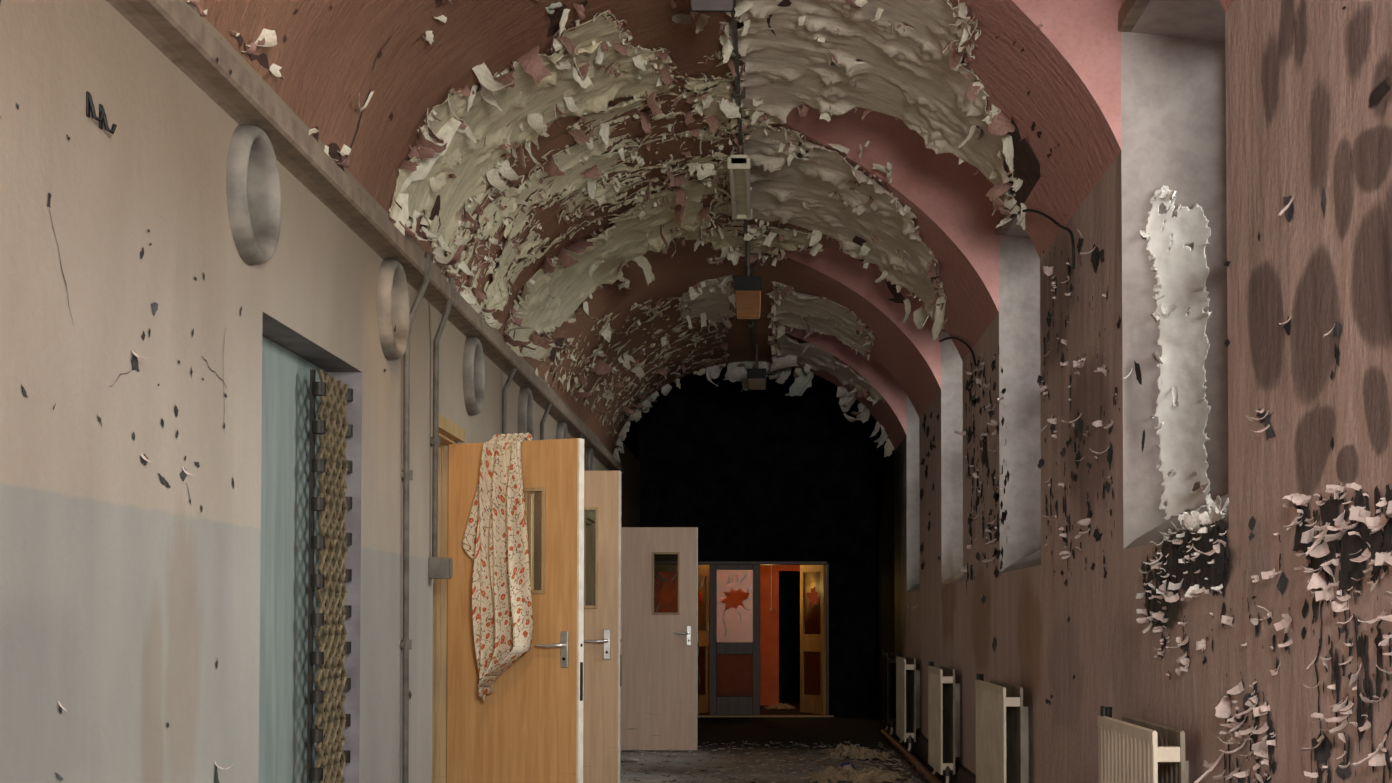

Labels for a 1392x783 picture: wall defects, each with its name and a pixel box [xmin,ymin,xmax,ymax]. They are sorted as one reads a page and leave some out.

peeling [186,0,207,16]
peeling [220,29,287,80]
water stain [1369,80,1390,107]
peeling [308,126,351,171]
peeling [389,0,1059,463]
peeling [1278,195,1295,223]
peeling [1279,315,1292,336]
peeling [1037,185,1231,586]
peeling [1246,407,1276,440]
peeling [920,412,941,570]
peeling [954,346,1010,604]
flaking render [1136,482,1392,783]